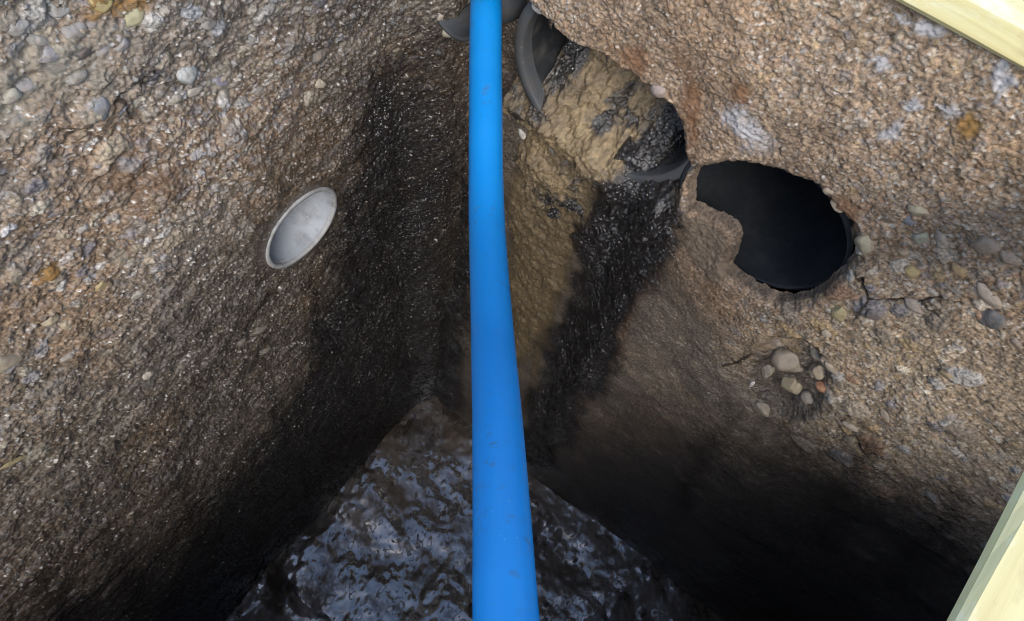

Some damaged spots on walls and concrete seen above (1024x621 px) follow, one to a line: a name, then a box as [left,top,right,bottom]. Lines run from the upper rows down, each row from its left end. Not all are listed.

water stain [159,36,471,621]
water stain [506,148,683,476]
crack [853,271,943,322]